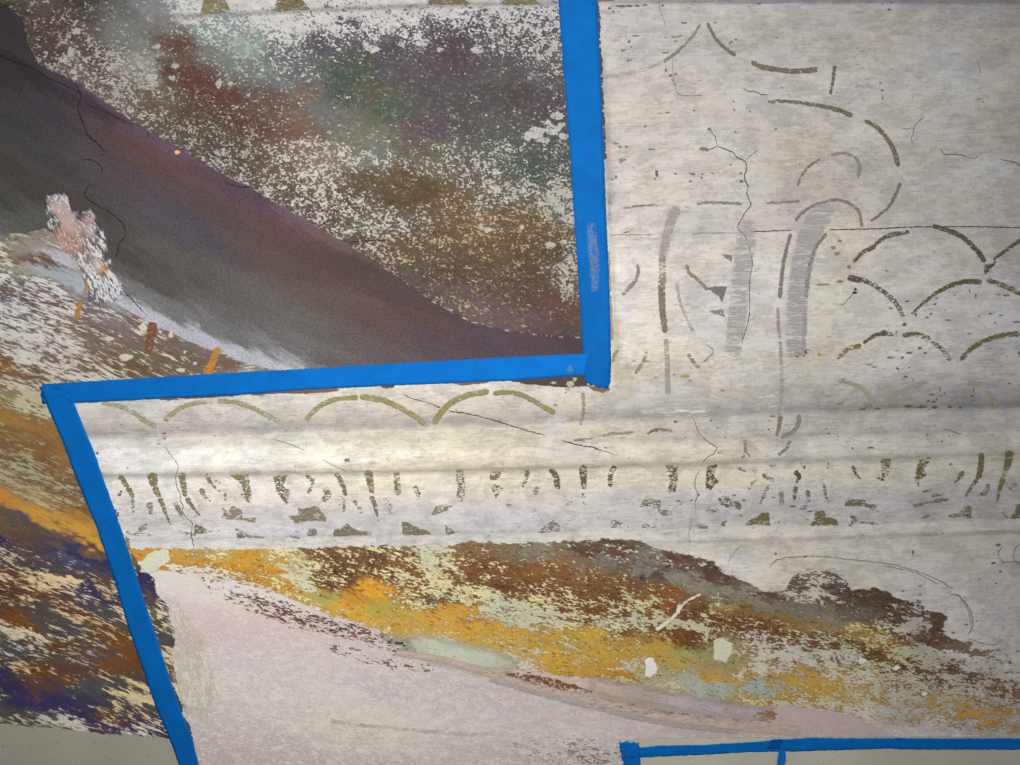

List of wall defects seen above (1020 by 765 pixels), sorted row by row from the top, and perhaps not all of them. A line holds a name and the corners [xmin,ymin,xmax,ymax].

crack [0,55,168,257]
peeling [0,0,582,338]
crack [706,131,756,343]
crack [165,447,194,546]
crack [403,394,613,454]
peeling [125,537,1020,737]